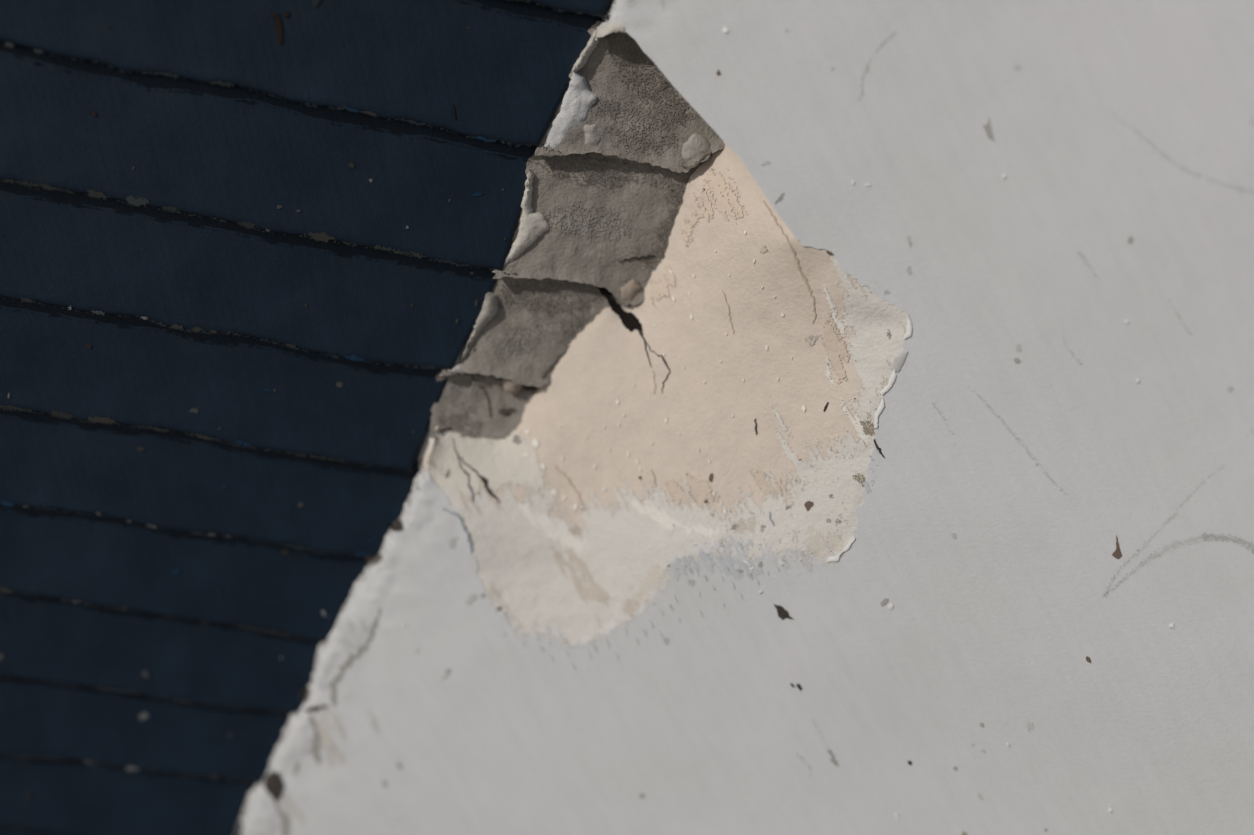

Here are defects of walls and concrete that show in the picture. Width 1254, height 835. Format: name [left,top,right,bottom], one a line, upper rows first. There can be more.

spalling [235,0,912,835]